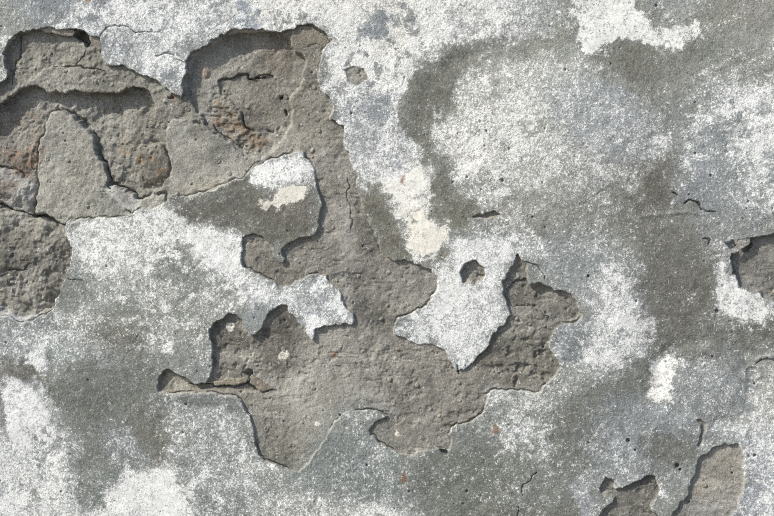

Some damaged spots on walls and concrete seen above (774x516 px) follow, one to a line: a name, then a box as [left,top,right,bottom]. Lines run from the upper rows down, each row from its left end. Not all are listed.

crack [217,73,275,81]
peeling [0,22,680,473]
flaking render [713,233,774,335]
flaking render [599,474,662,516]
flaking render [671,418,747,516]